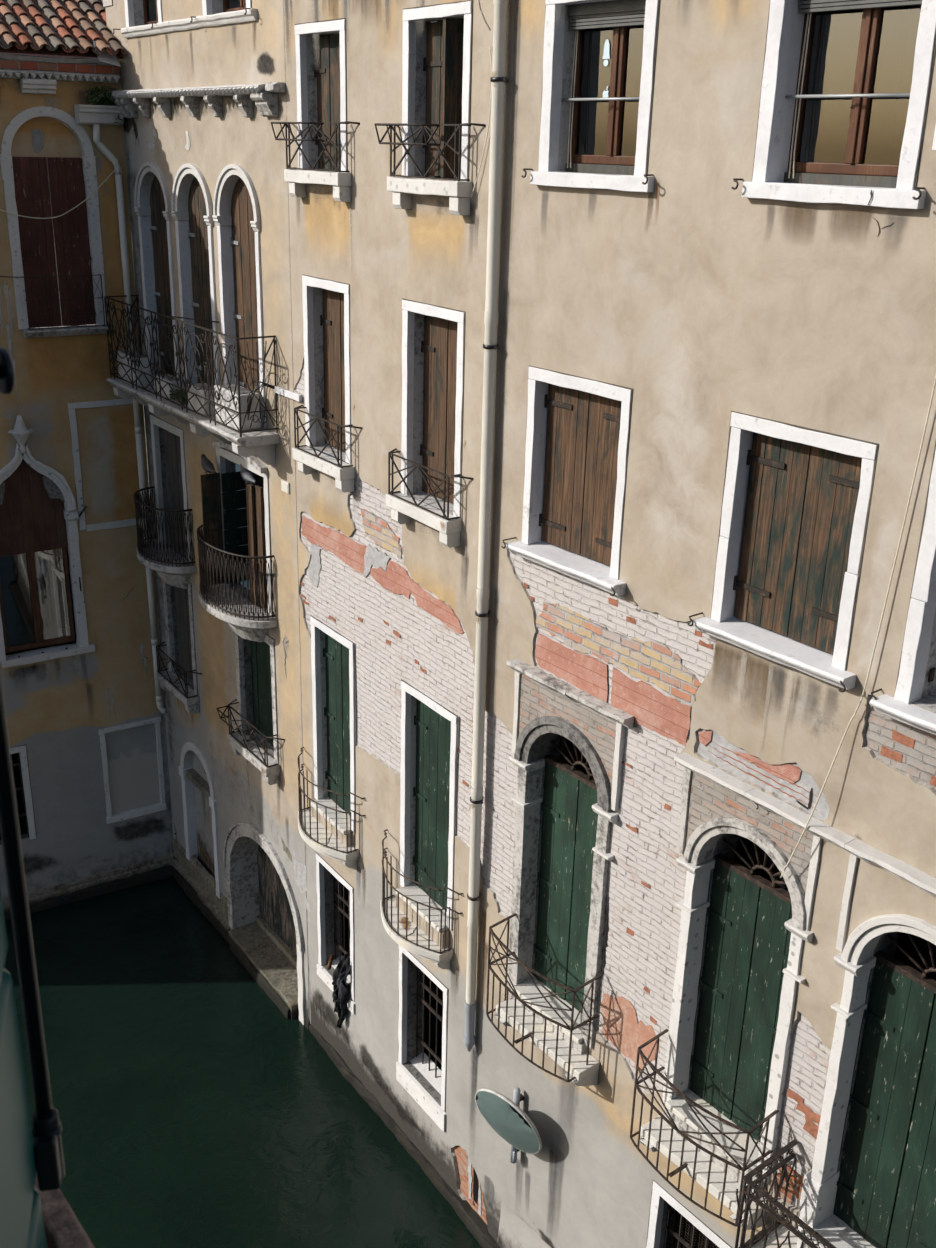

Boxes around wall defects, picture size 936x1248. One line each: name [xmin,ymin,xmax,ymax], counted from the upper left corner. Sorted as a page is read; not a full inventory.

flaking render [299,474,518,917]
flaking render [507,549,830,1094]
flaking render [862,695,936,795]
water stain [313,992,423,1134]
flaking render [773,1011,831,1213]